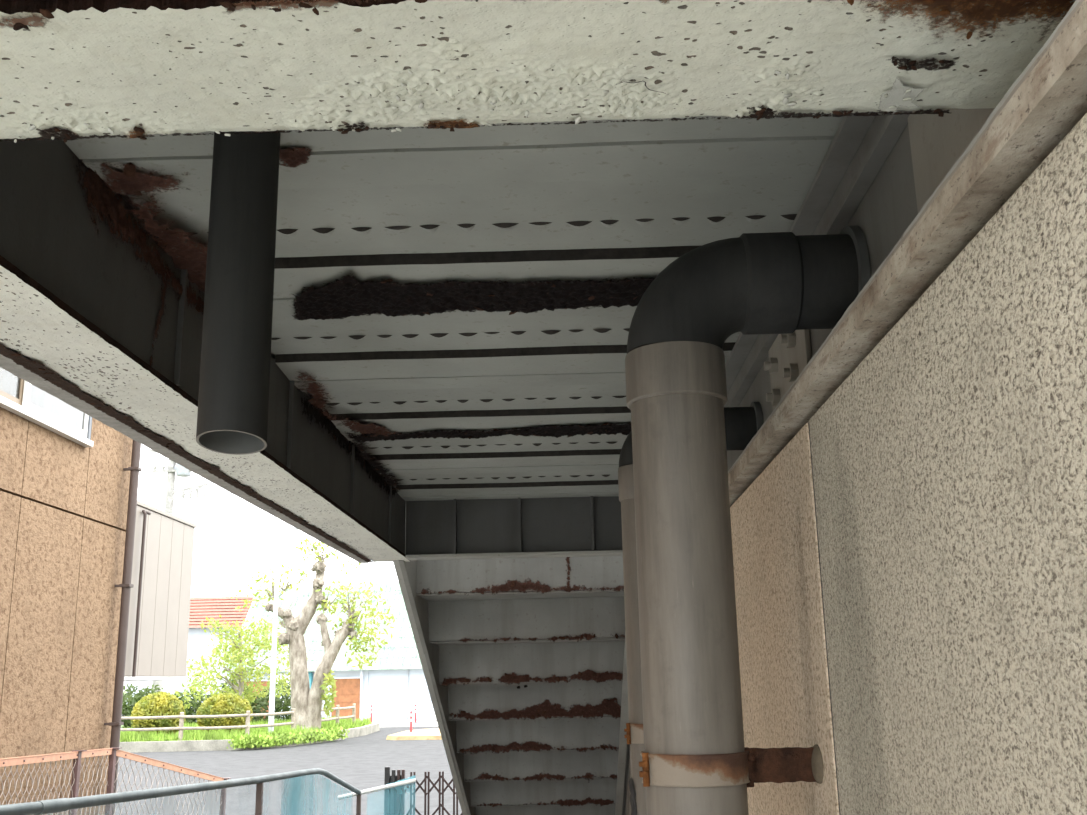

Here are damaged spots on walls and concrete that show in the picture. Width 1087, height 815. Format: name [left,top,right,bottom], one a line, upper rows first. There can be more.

rust [0,8,54,31]
rust [219,0,340,15]
rust [847,0,1075,41]
rust [0,105,950,143]
rust [76,162,207,366]
rust [292,273,655,320]
rust [0,344,374,562]
rust [296,371,632,498]
rust [421,557,624,595]
rust [442,670,623,689]
rust [449,698,621,721]
rust [459,741,619,754]